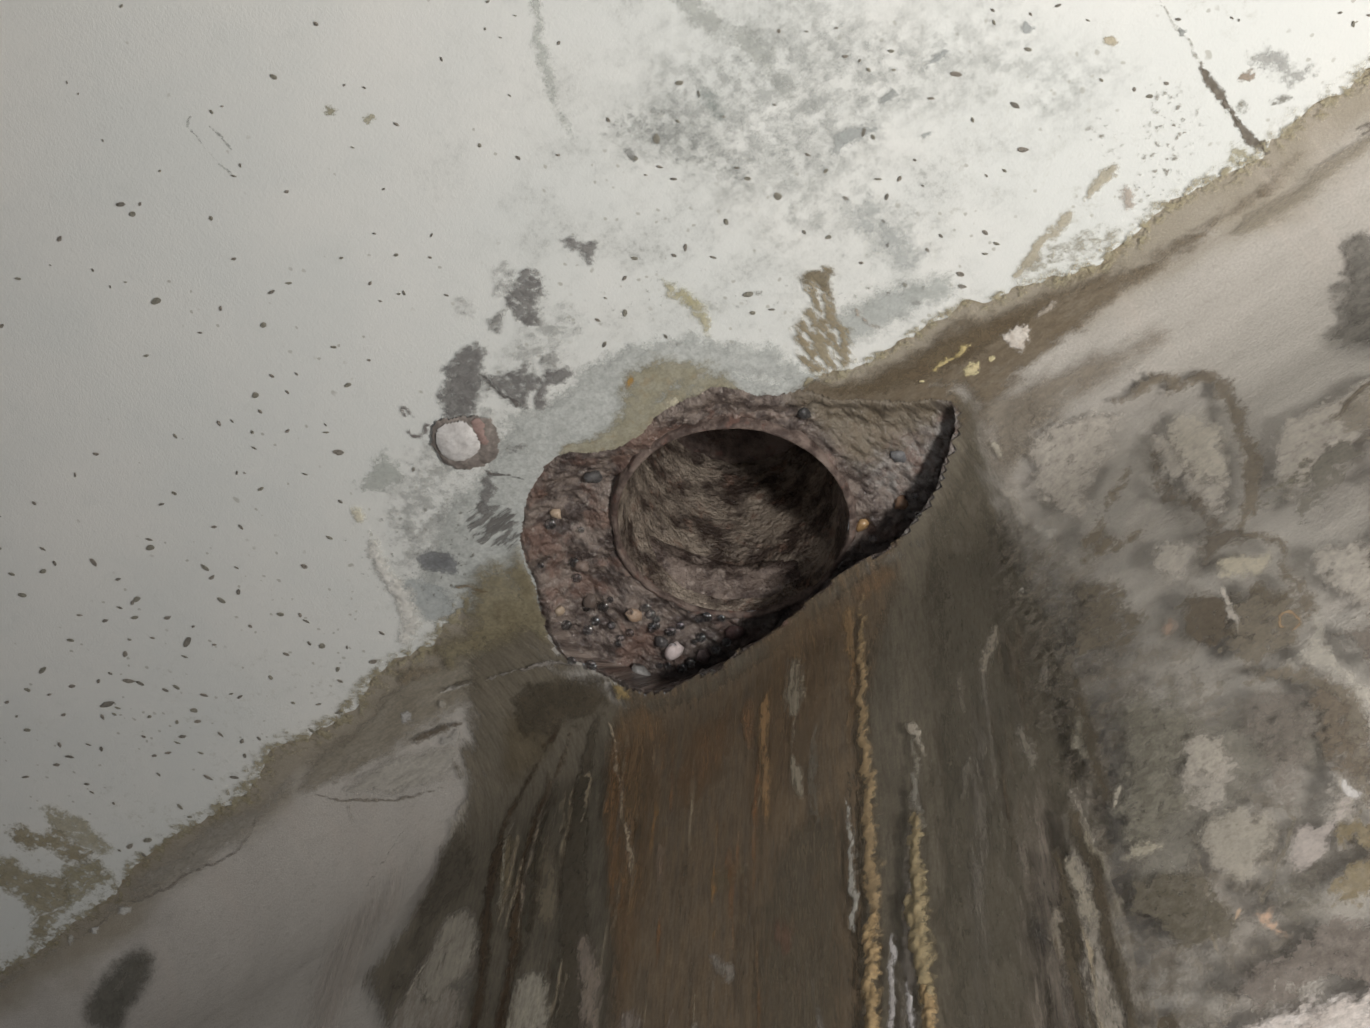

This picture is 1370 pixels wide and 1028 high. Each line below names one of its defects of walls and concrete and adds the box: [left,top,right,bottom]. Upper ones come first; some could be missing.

water stain [630,30,877,160]
water stain [858,72,898,104]
crack [1167,12,1270,155]
water stain [1087,165,1149,208]
water stain [1236,138,1370,233]
rust [471,418,489,445]
rust [559,359,736,455]
water stain [134,212,1370,1028]
water stain [85,950,154,1028]
peeling [1248,990,1370,1028]